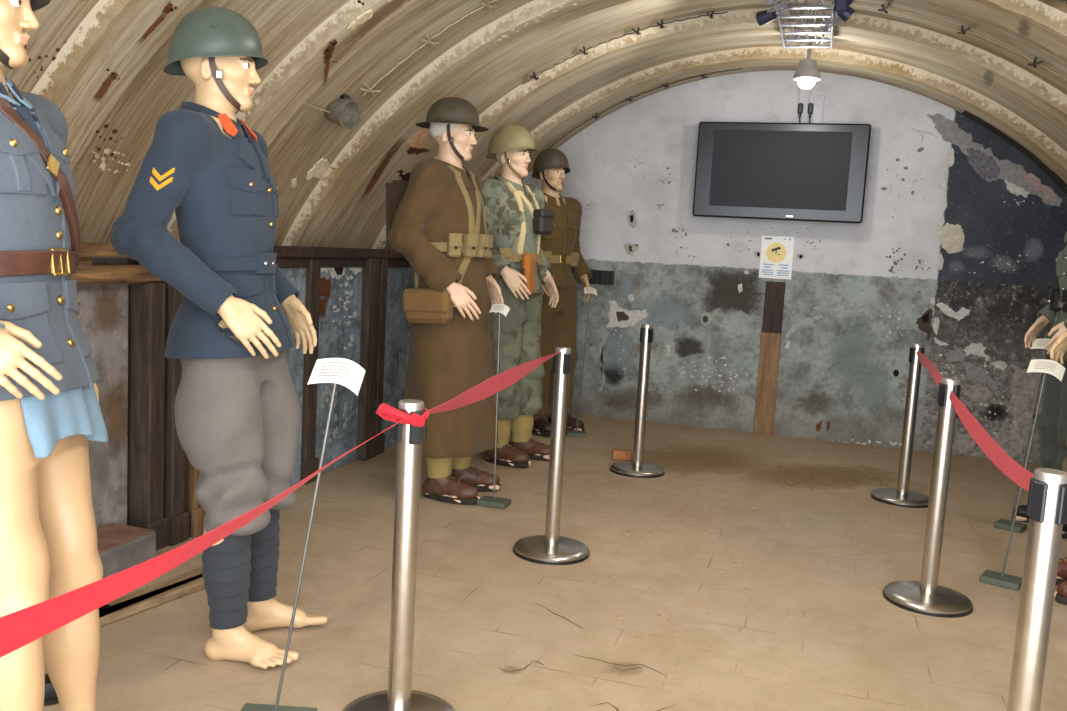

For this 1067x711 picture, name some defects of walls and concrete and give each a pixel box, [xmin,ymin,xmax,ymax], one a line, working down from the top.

peeling [927,113,1063,227]
peeling [915,254,944,271]
peeling [701,270,762,326]
spalling [599,294,648,392]
peeling [657,326,752,395]